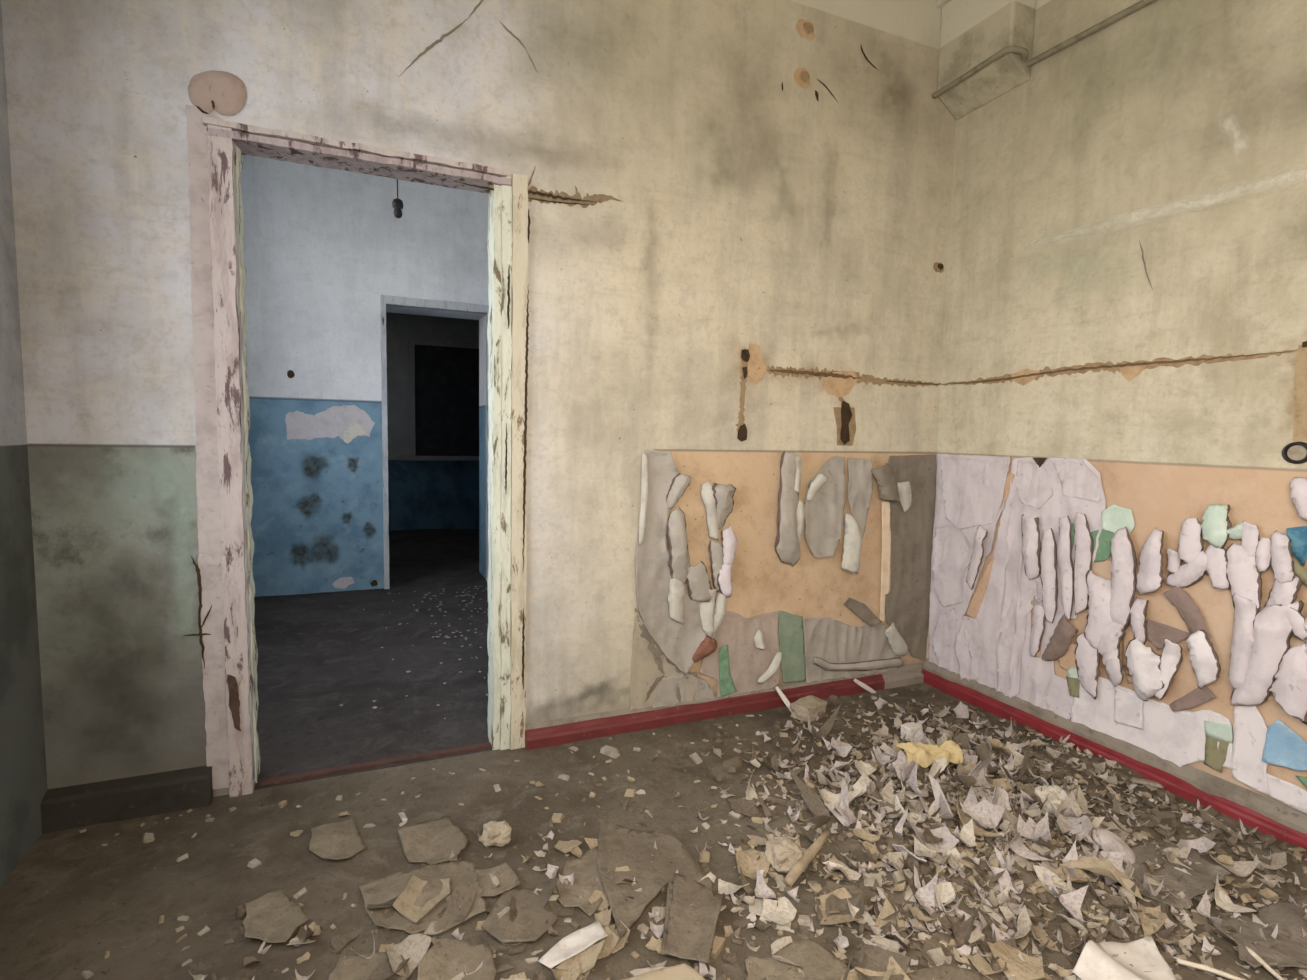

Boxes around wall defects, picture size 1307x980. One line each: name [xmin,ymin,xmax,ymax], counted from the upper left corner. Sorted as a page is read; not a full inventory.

crack [400,0,538,76]
water stain [1125,170,1307,223]
crack [454,165,623,567]
flaking render [185,70,247,789]
water stain [304,457,325,476]
peeling [285,405,375,444]
water stain [292,538,337,566]
crack [184,556,212,669]
crack [519,608,527,690]
peeling [630,450,1307,814]